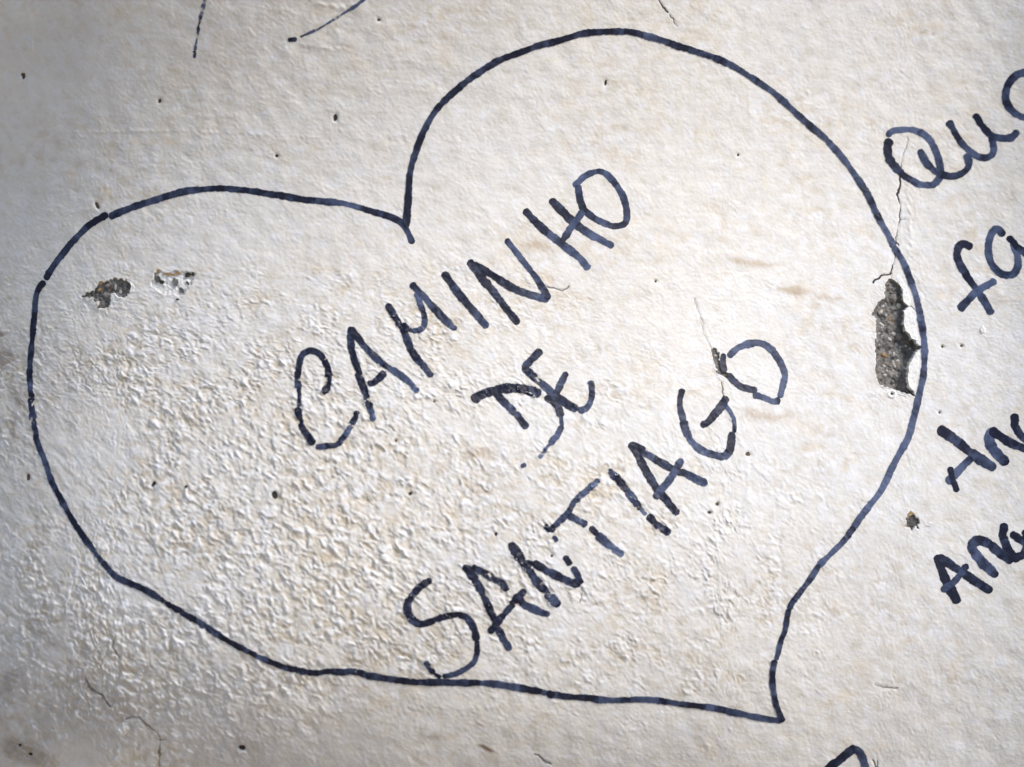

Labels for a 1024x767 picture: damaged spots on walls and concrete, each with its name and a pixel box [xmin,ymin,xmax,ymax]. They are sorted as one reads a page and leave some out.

crack [872,175,904,283]
spalling [82,278,135,311]
spalling [152,269,195,300]
spalling [872,273,921,399]